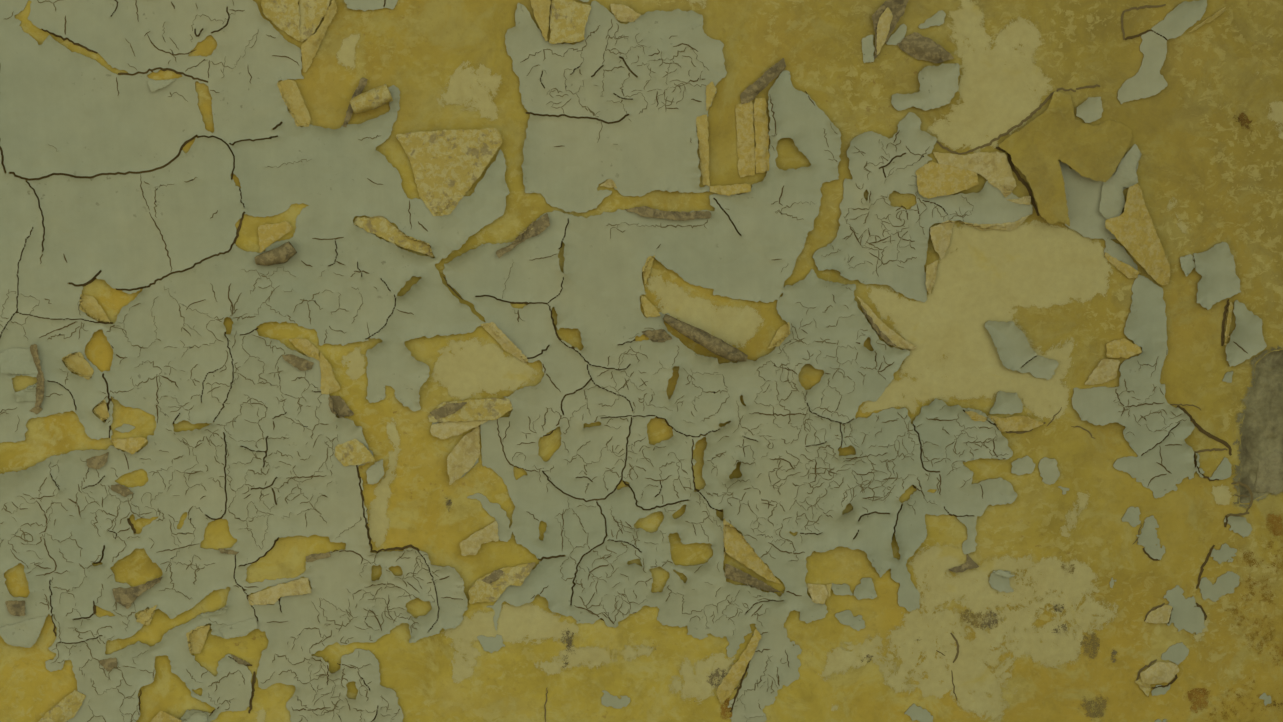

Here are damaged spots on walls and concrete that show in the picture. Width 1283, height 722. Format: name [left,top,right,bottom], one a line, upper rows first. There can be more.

crack [5,0,299,101]
crack [522,19,708,147]
peeling [1117,0,1226,104]
crack [0,122,463,722]
peeling [0,0,917,722]
peeling [812,0,1204,722]
spalling [1180,242,1283,509]
crack [1221,299,1247,353]
crack [1114,353,1253,624]
peeling [1224,516,1252,538]
crack [1136,659,1178,697]